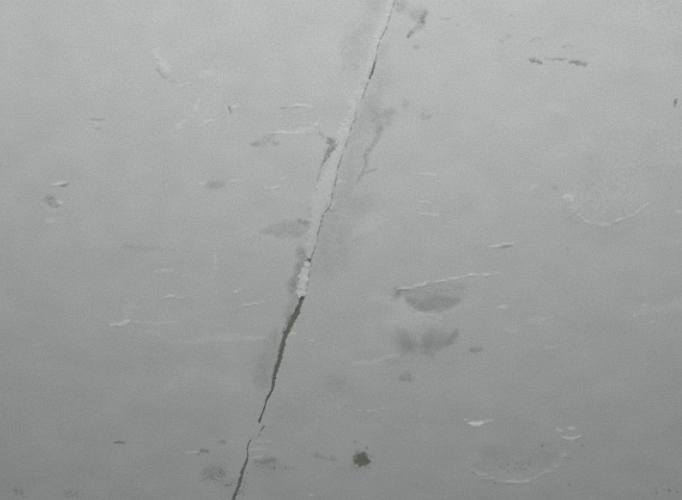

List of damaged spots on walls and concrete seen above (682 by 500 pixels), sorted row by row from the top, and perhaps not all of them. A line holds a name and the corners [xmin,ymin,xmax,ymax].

crack [231,0,396,500]
damp [388,322,462,363]